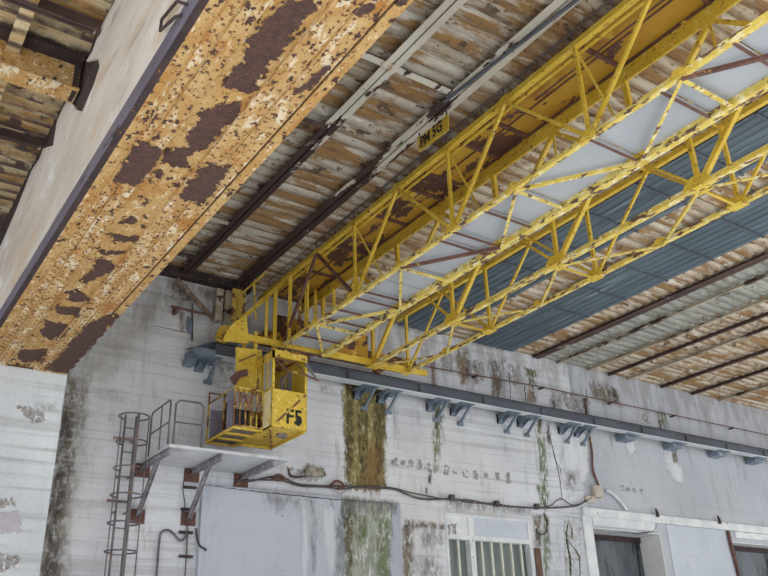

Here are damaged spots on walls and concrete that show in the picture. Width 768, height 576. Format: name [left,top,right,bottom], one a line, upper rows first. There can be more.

peeling [113,0,318,206]
peeling [17,232,140,373]
damp [456,350,469,384]
peeling [17,405,45,424]
damp [345,383,385,490]
damp [41,377,85,576]
peeling [0,553,22,572]
peeling [0,497,23,533]
damp [323,500,396,576]
damp [403,520,444,576]